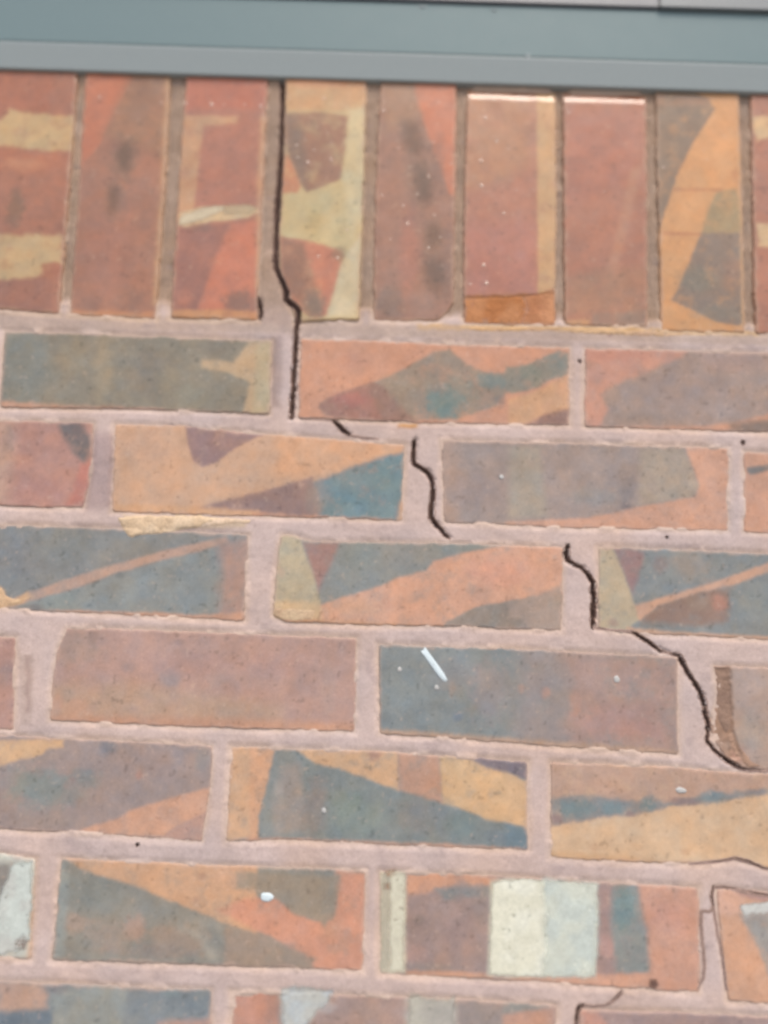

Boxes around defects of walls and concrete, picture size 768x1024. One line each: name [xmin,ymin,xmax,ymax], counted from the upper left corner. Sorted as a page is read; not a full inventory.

crack [256,81,379,440]
crack [410,440,451,540]
crack [562,545,768,773]